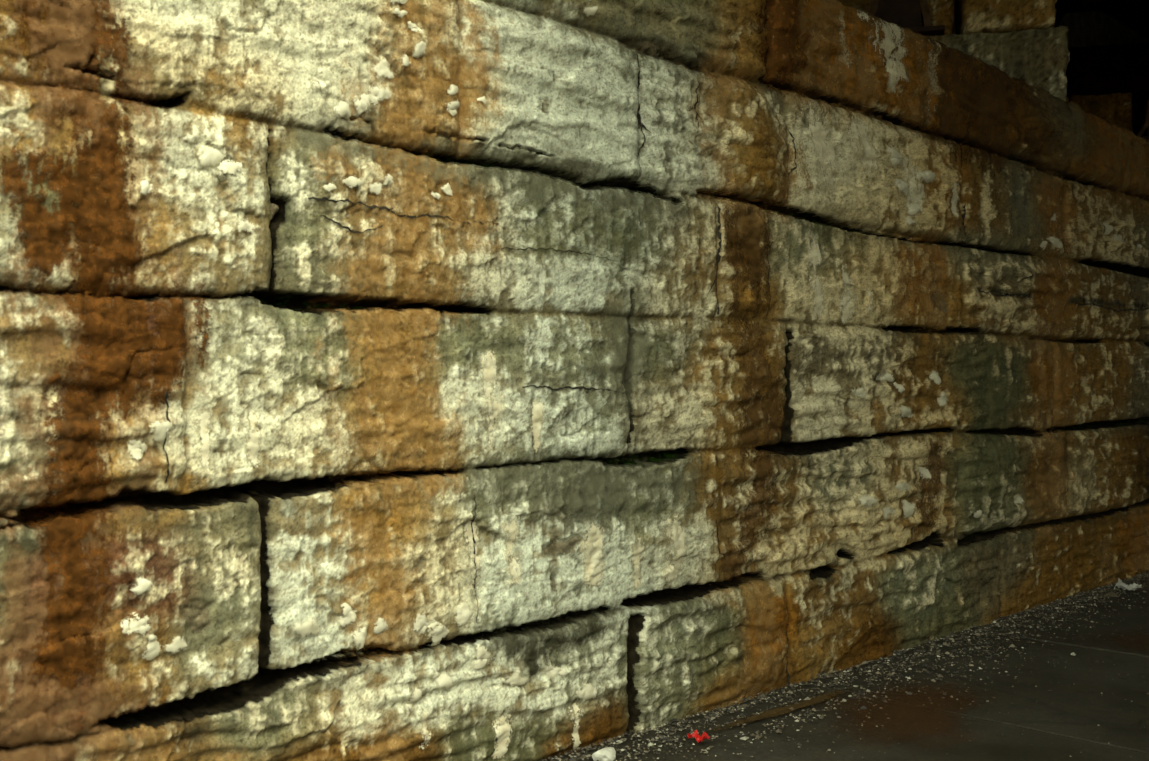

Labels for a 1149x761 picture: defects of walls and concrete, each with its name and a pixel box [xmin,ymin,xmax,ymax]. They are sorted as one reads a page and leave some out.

corrosion [1,0,212,695]
corrosion [314,0,500,657]
crack [308,197,610,260]
corrosion [696,0,819,587]
corrosion [911,438,947,537]